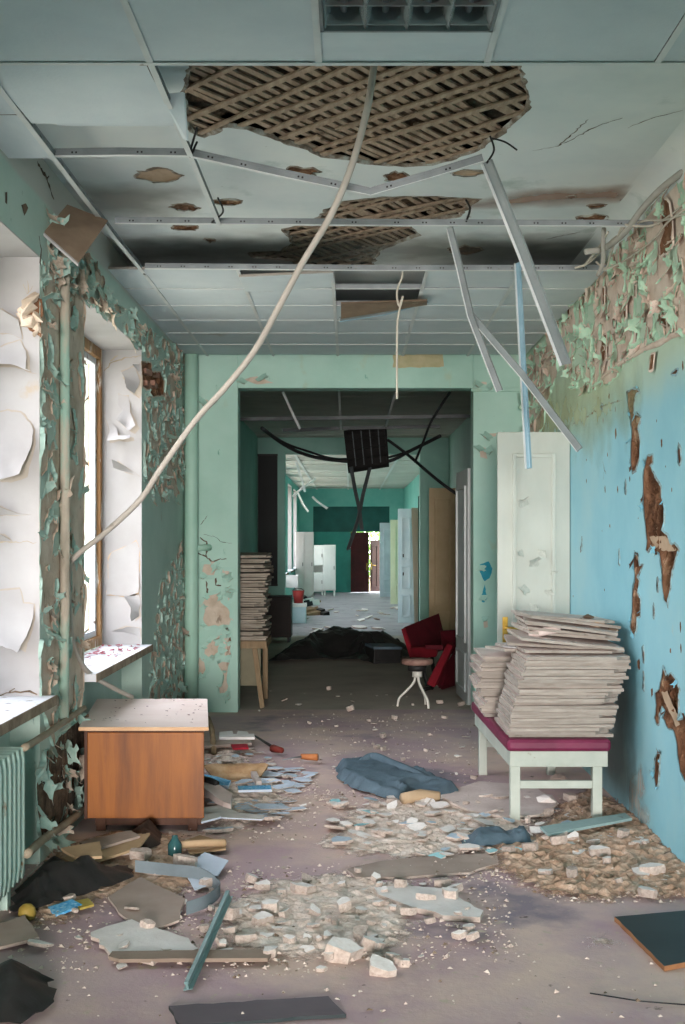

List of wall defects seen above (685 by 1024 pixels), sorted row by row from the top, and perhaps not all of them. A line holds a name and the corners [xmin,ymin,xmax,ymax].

crack [533,110,683,151]
spalling [133,167,185,183]
spalling [213,198,243,206]
peeling [519,173,685,782]
peeling [0,202,237,855]
spalling [650,749,661,790]